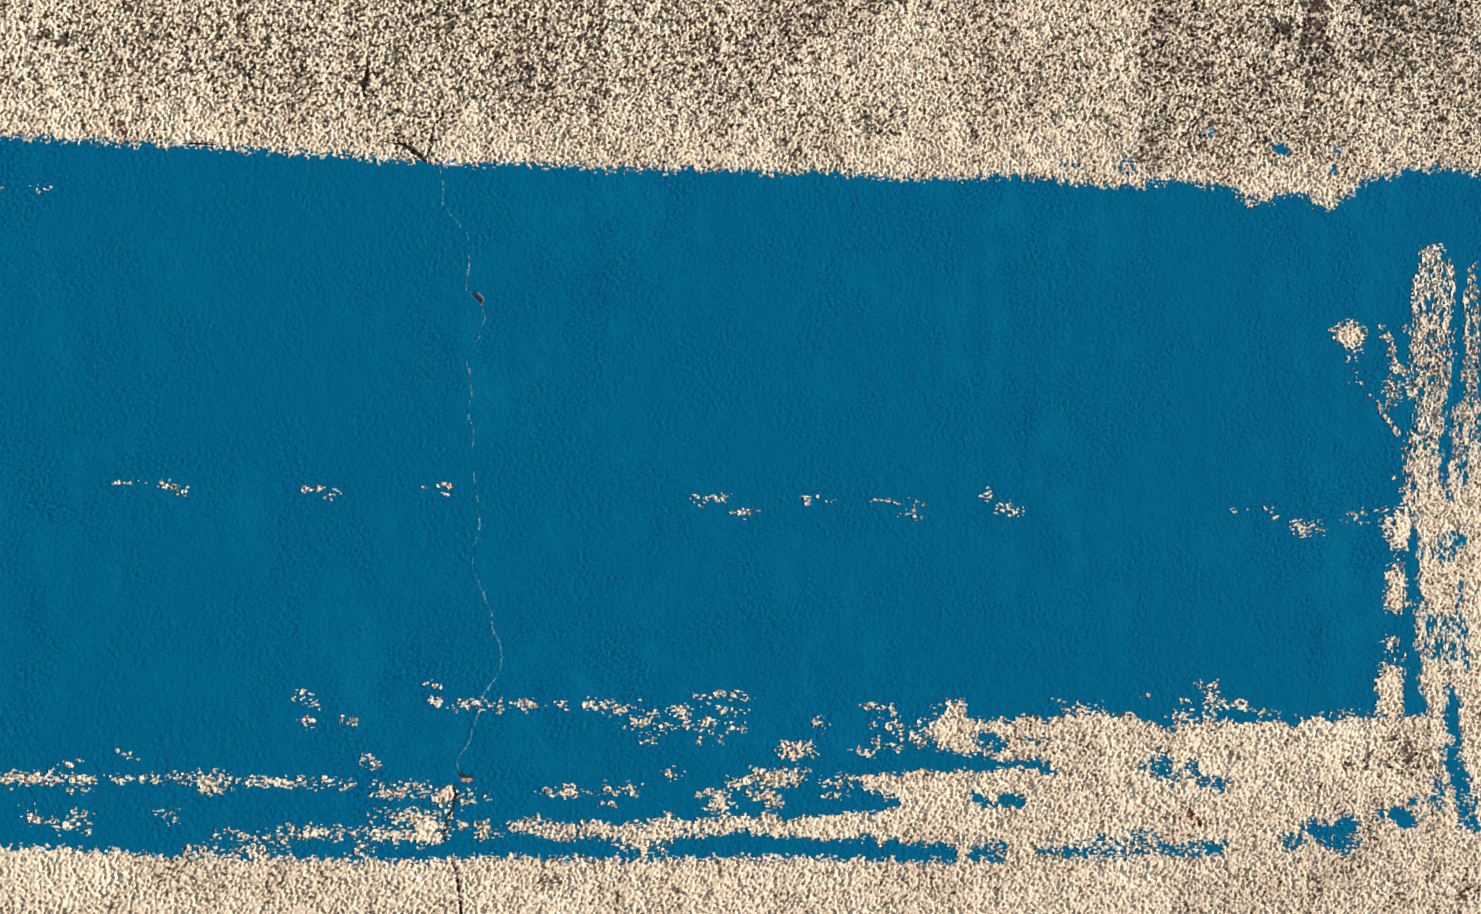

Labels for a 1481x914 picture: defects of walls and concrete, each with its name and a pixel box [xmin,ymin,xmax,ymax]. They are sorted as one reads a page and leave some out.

crack [357,52,369,97]
peeling [1230,241,1481,616]
peeling [111,479,188,496]
peeling [301,485,340,499]
peeling [421,482,454,497]
crack [379,110,503,914]
peeling [688,493,759,520]
peeling [870,497,927,521]
peeling [978,487,1025,517]
peeling [0,634,1433,865]